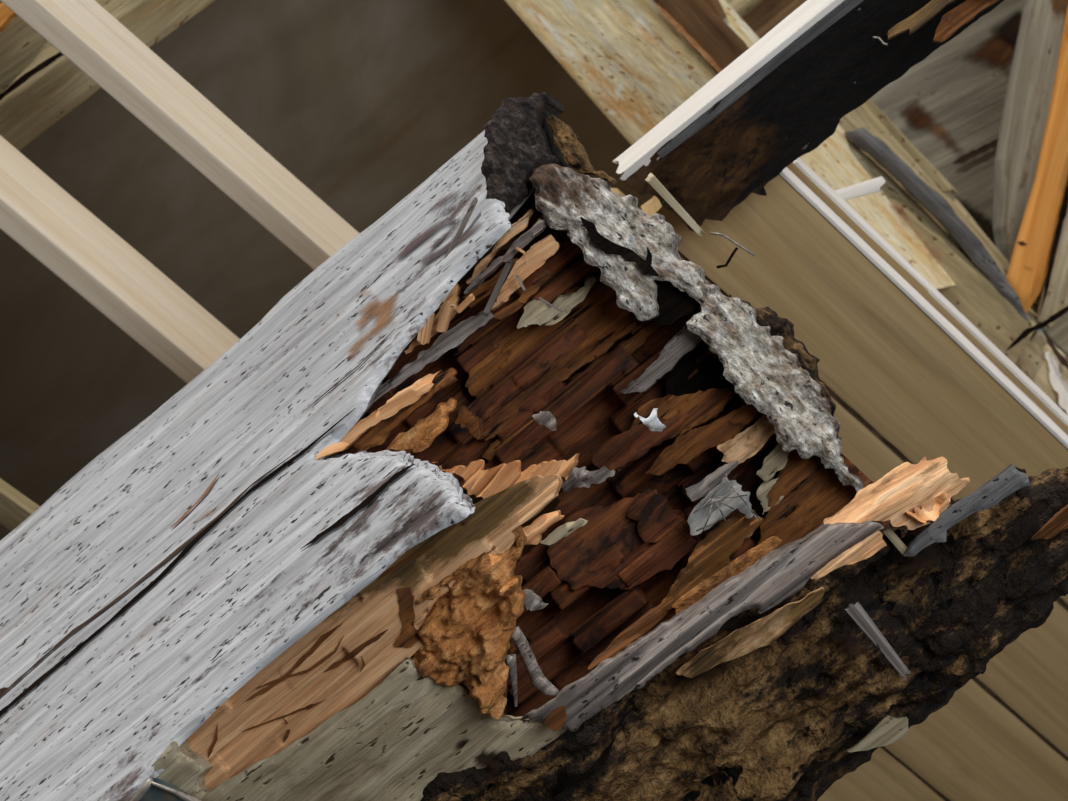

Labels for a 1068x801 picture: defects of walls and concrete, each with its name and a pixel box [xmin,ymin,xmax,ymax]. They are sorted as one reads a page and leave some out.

crack [0,52,63,101]
crack [301,329,395,414]
peeling [1045,351,1068,416]
crack [301,464,414,549]
crack [0,408,355,716]
crack [376,545,435,579]
spalling [394,587,420,648]
crack [247,623,389,701]
crack [208,699,326,758]
peeling [544,706,567,732]